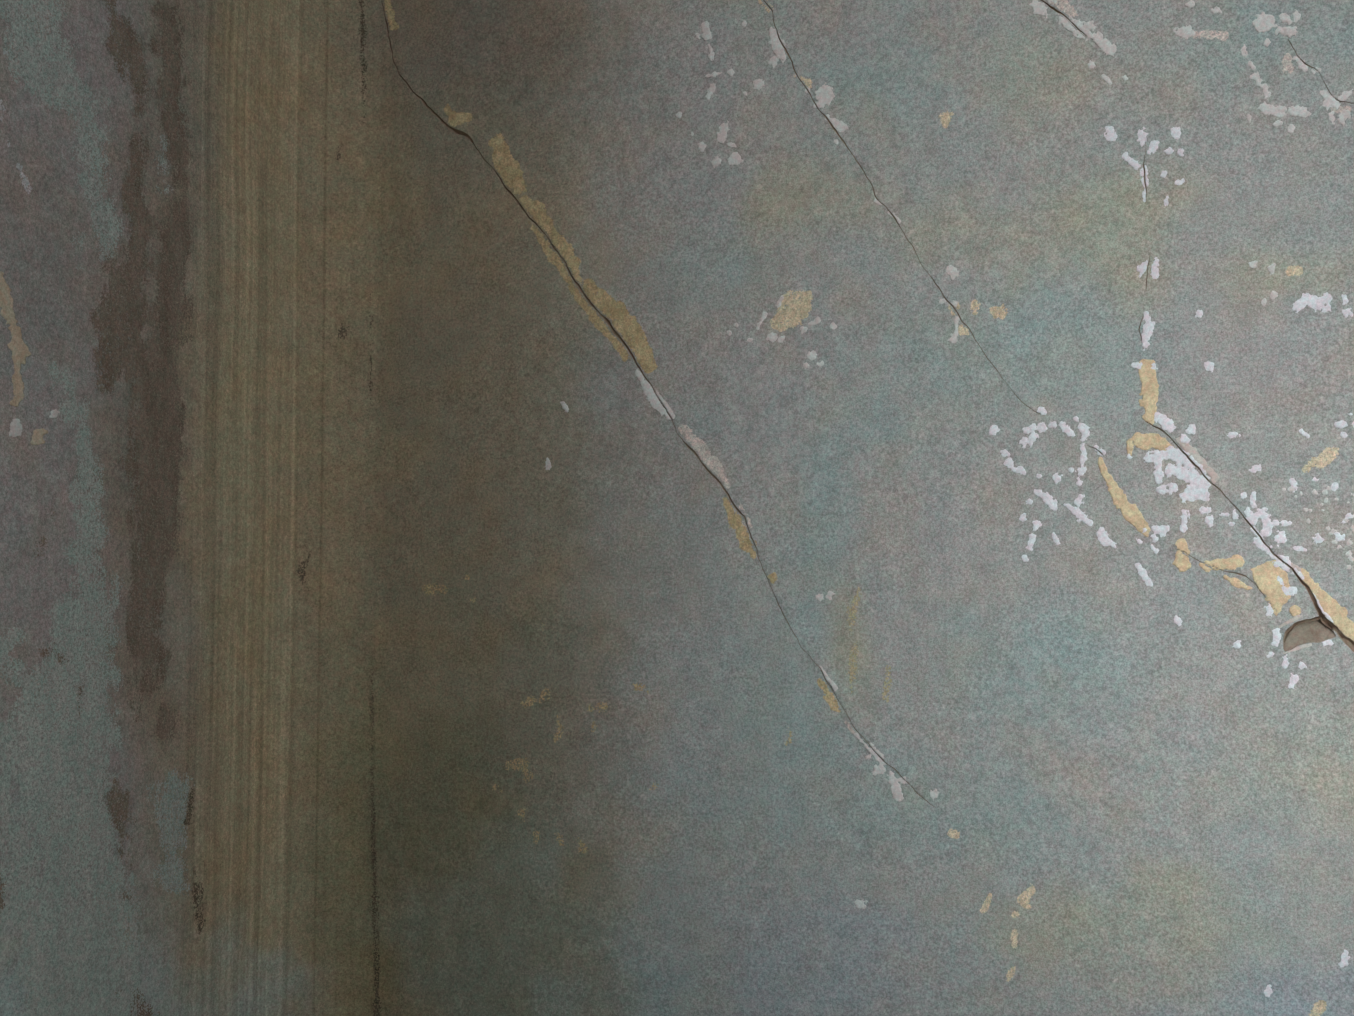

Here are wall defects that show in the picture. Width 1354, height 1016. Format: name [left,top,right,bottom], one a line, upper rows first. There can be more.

crack [1029,0,1128,85]
crack [1191,29,1354,133]
peeling [1252,9,1301,47]
crack [758,0,1037,413]
crack [1104,126,1185,206]
peeling [1292,292,1354,318]
leakage [0,0,206,1016]
crack [382,0,939,807]
peeling [1000,407,1170,562]
crack [1126,256,1354,689]
peeling [1282,413,1354,570]
spalling [1279,615,1336,654]